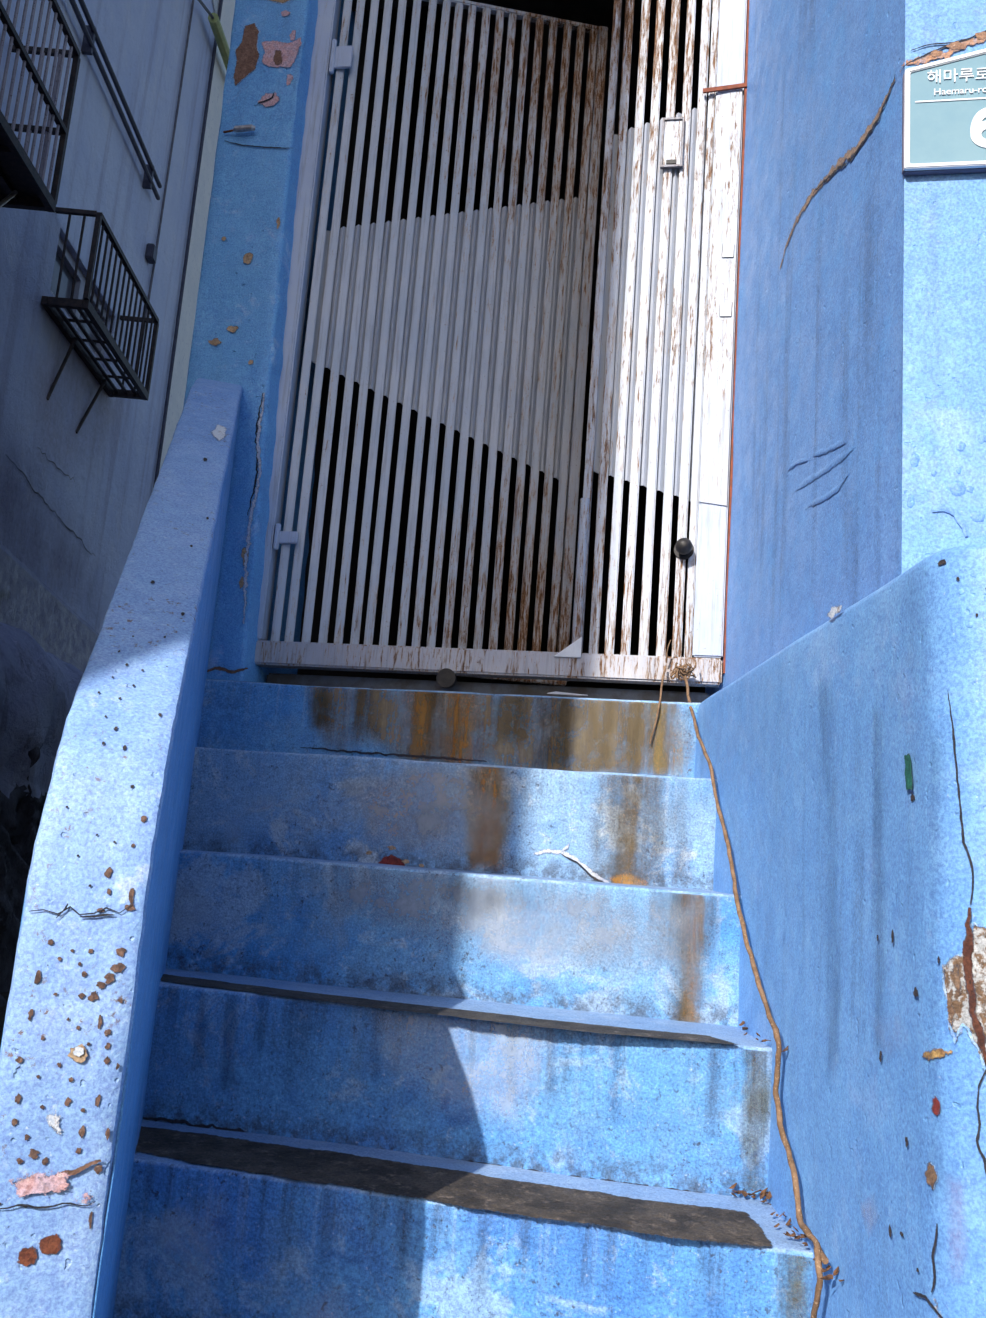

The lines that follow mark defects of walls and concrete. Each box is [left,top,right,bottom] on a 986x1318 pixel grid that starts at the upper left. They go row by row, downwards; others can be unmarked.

peeling [233,0,302,107]
crack [780,30,986,269]
rust [313,687,683,885]
crack [948,694,974,905]
crack [29,904,133,918]
peeling [97,867,113,912]
peeling [125,888,136,911]
spalling [922,907,986,1071]
peeling [40,939,126,1154]
peeling [12,1093,49,1165]
crack [976,1061,986,1173]